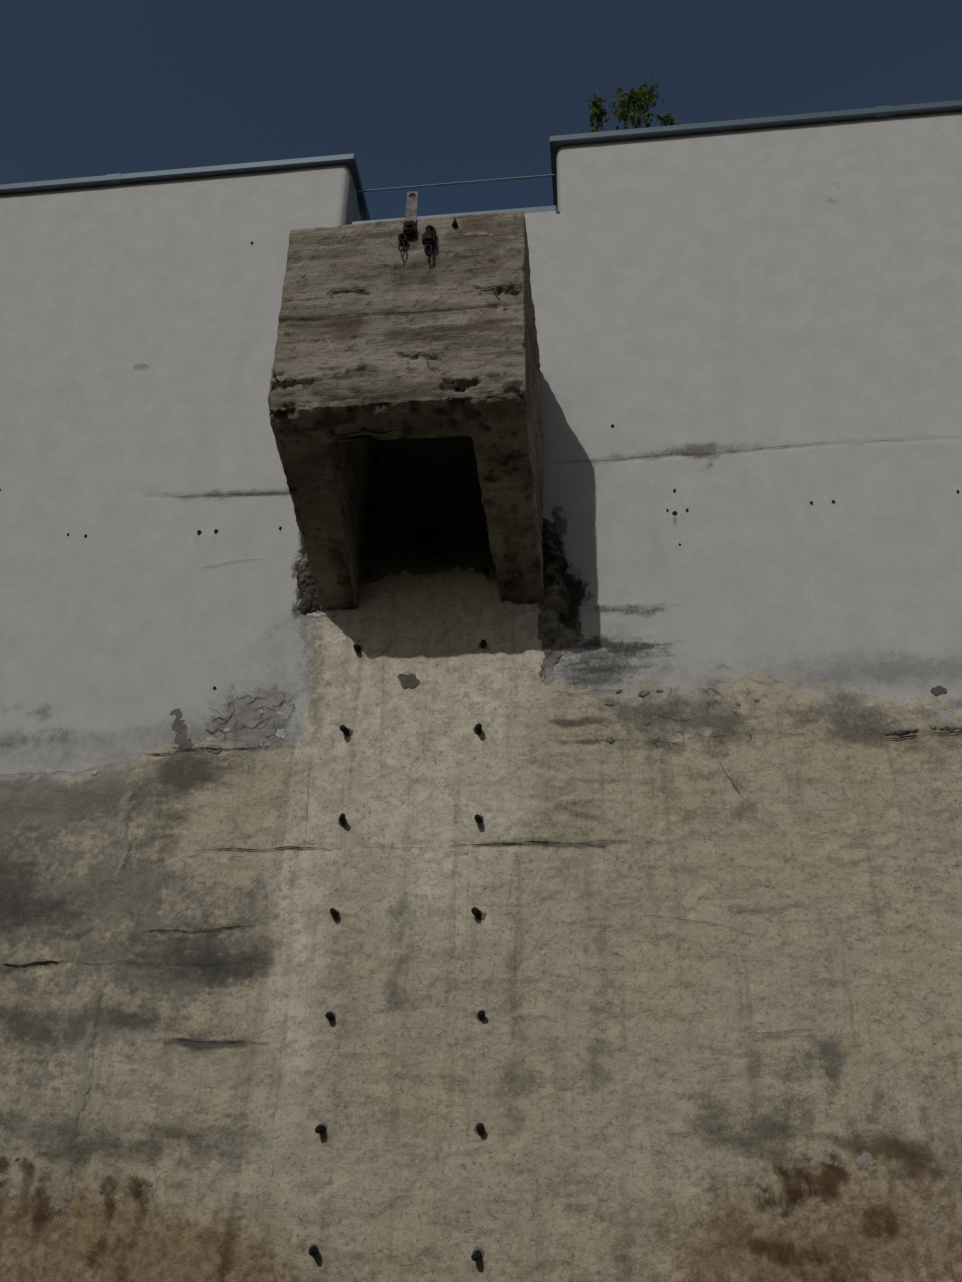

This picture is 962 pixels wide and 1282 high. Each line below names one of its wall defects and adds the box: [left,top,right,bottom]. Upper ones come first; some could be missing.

spalling [292,530,321,615]
spalling [537,507,783,747]
damp [569,636,660,683]
peeling [143,683,299,759]
crack [185,763,632,906]
crack [0,925,272,971]
damp [172,1039,246,1049]
crack [168,1036,270,1044]
damp [804,1147,875,1172]